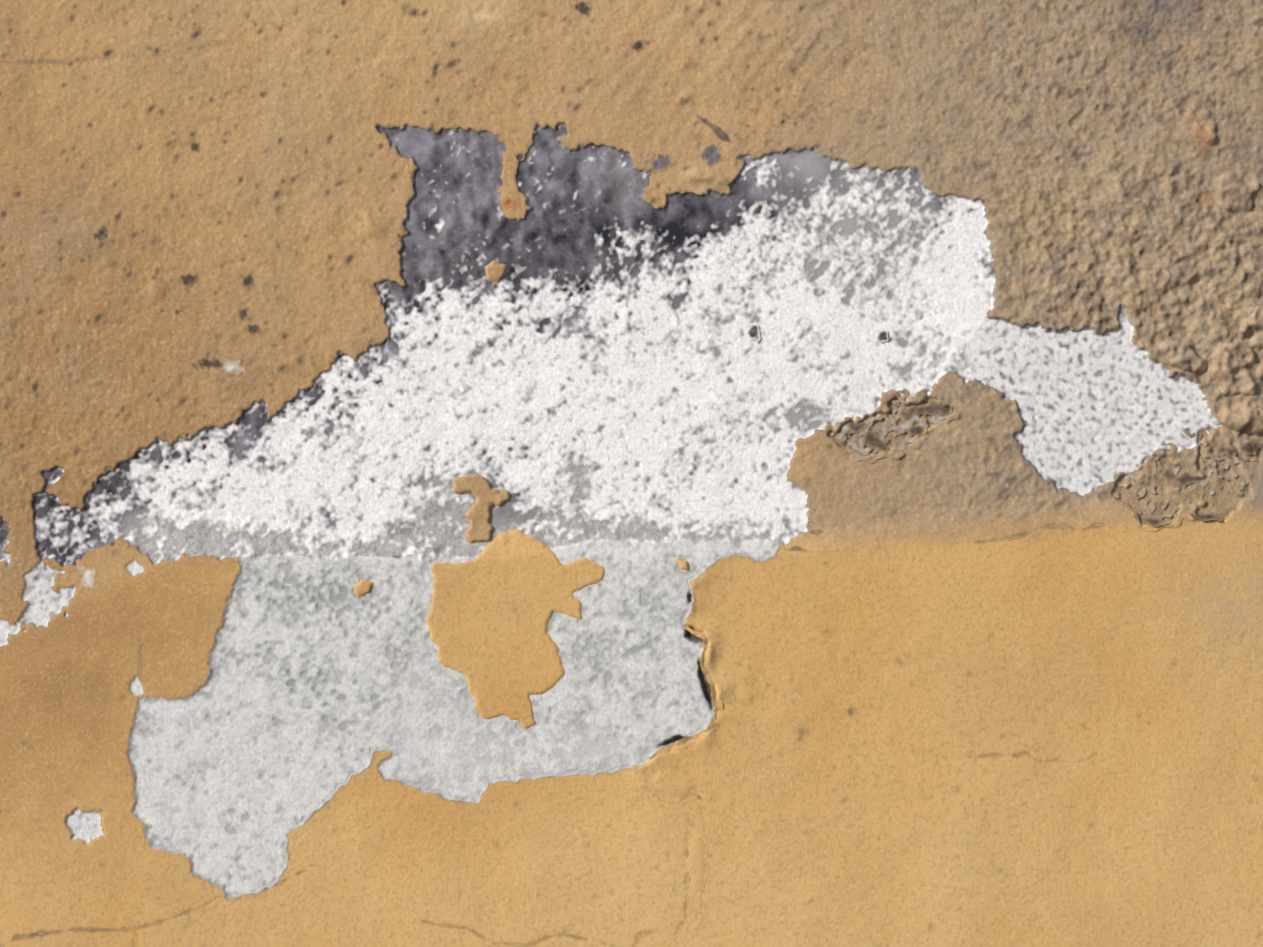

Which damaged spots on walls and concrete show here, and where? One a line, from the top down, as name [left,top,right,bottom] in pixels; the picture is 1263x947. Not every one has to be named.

peeling [0,516,12,567]
peeling [32,122,1263,899]
peeling [0,561,76,647]
crack [0,896,228,947]
crack [261,864,313,892]
crack [421,813,690,947]